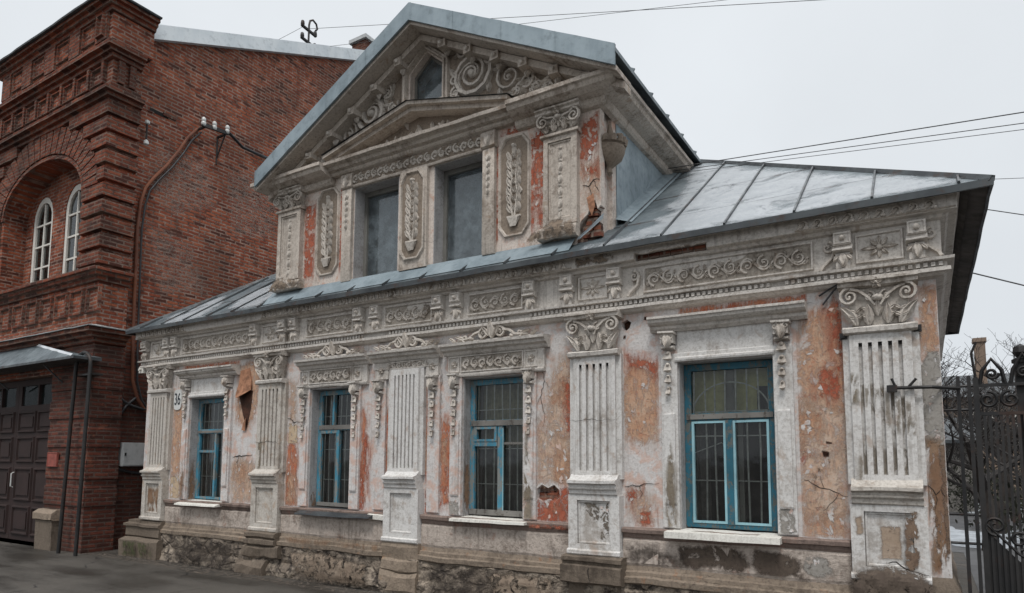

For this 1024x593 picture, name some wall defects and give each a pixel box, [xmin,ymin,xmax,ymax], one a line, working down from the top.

spalling [507,113,605,243]
peeling [269,204,316,292]
peeling [285,384,298,506]
peeling [529,356,570,529]
peeling [626,488,652,525]
peeling [624,354,659,445]
peeling [680,294,864,538]
crack [806,476,847,510]
flaking render [881,512,920,571]
flaking render [918,286,944,446]